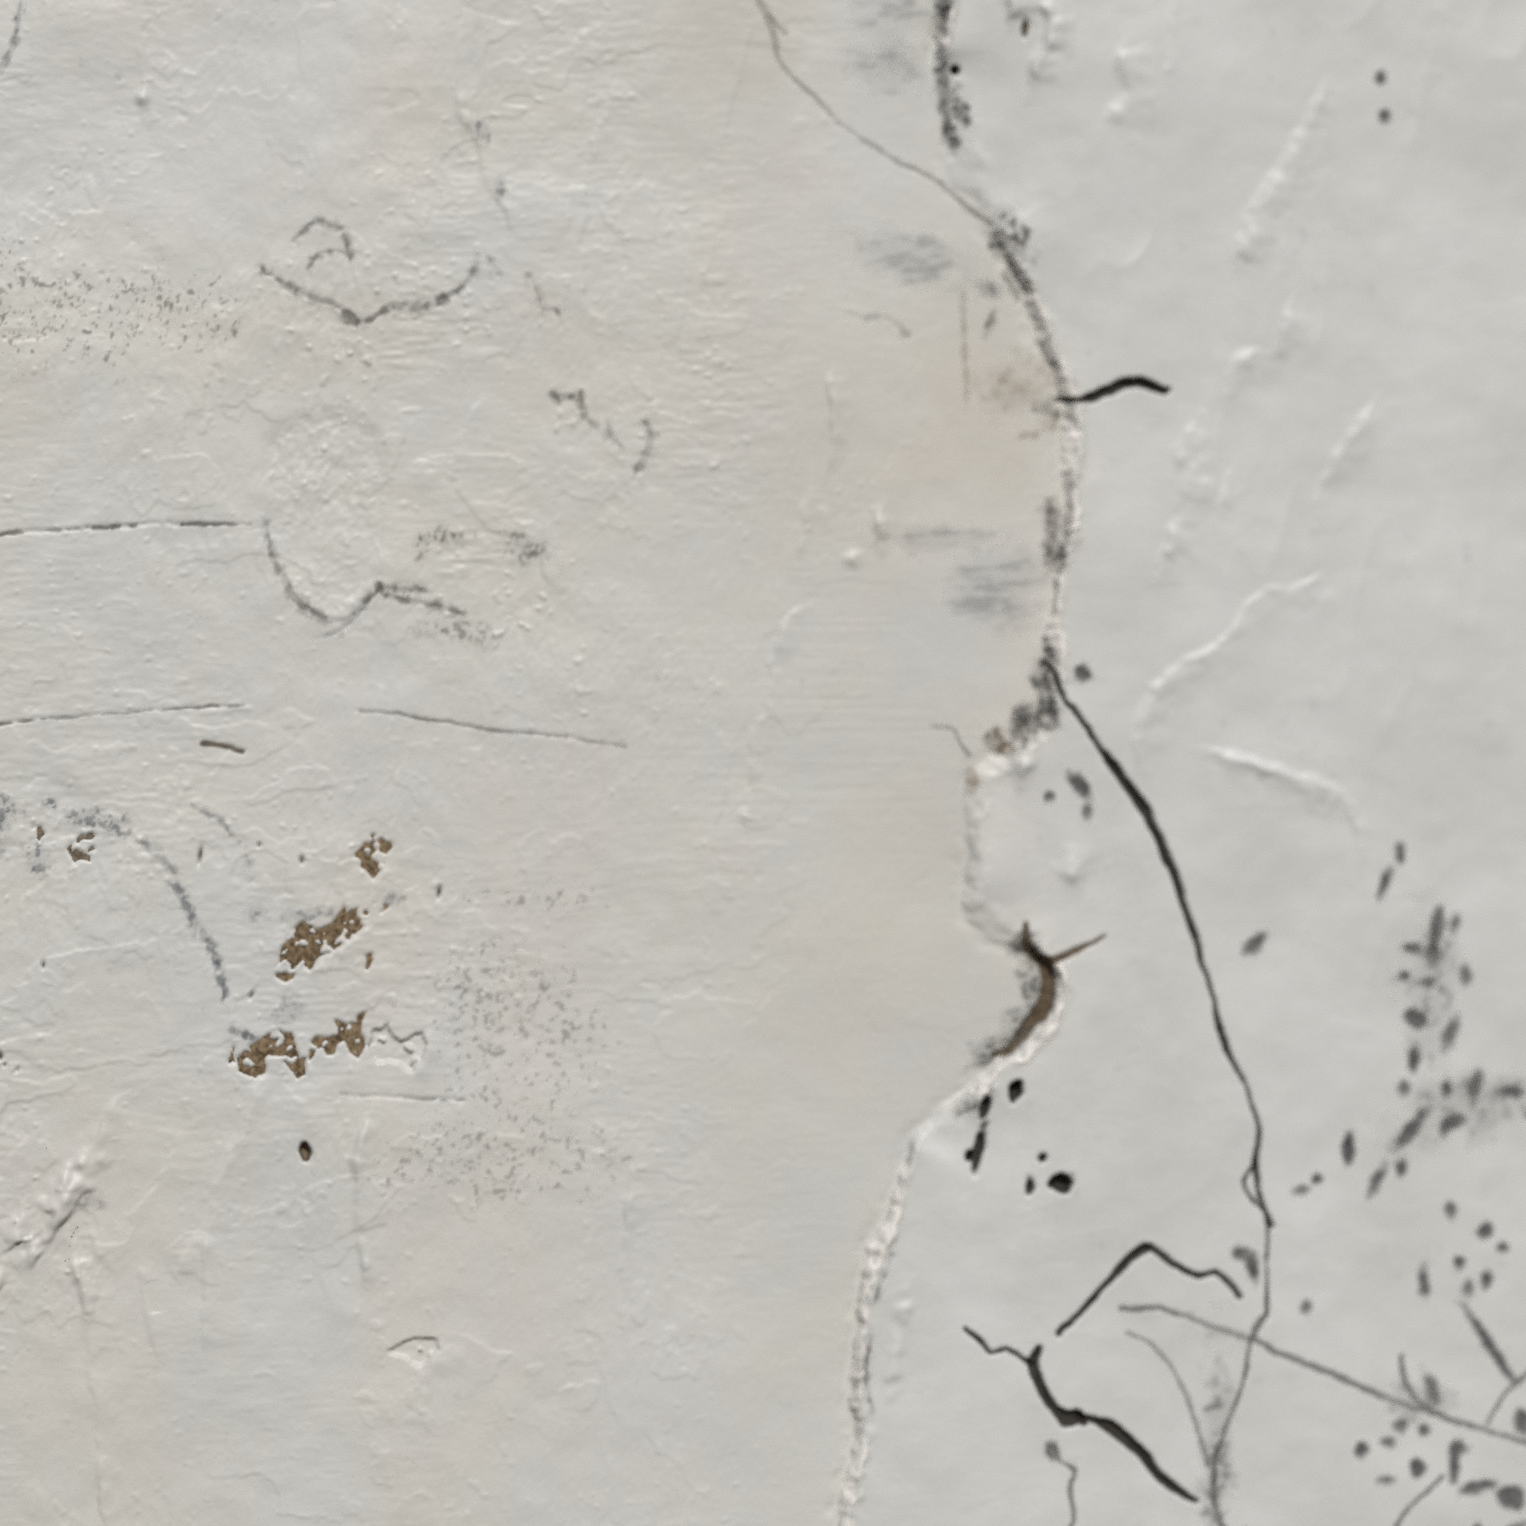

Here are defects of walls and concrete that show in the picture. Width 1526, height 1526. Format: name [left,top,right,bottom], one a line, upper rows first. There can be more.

peeling [996,229,1076,398]
crack [1055,377,1171,402]
peeling [1044,420,1091,682]
spalling [1069,775,1090,816]
spalling [276,834,411,997]
peeling [965,962,1068,1172]
spalling [1026,1154,1072,1194]
crack [963,661,1526,1526]
peeling [840,1160,911,1526]